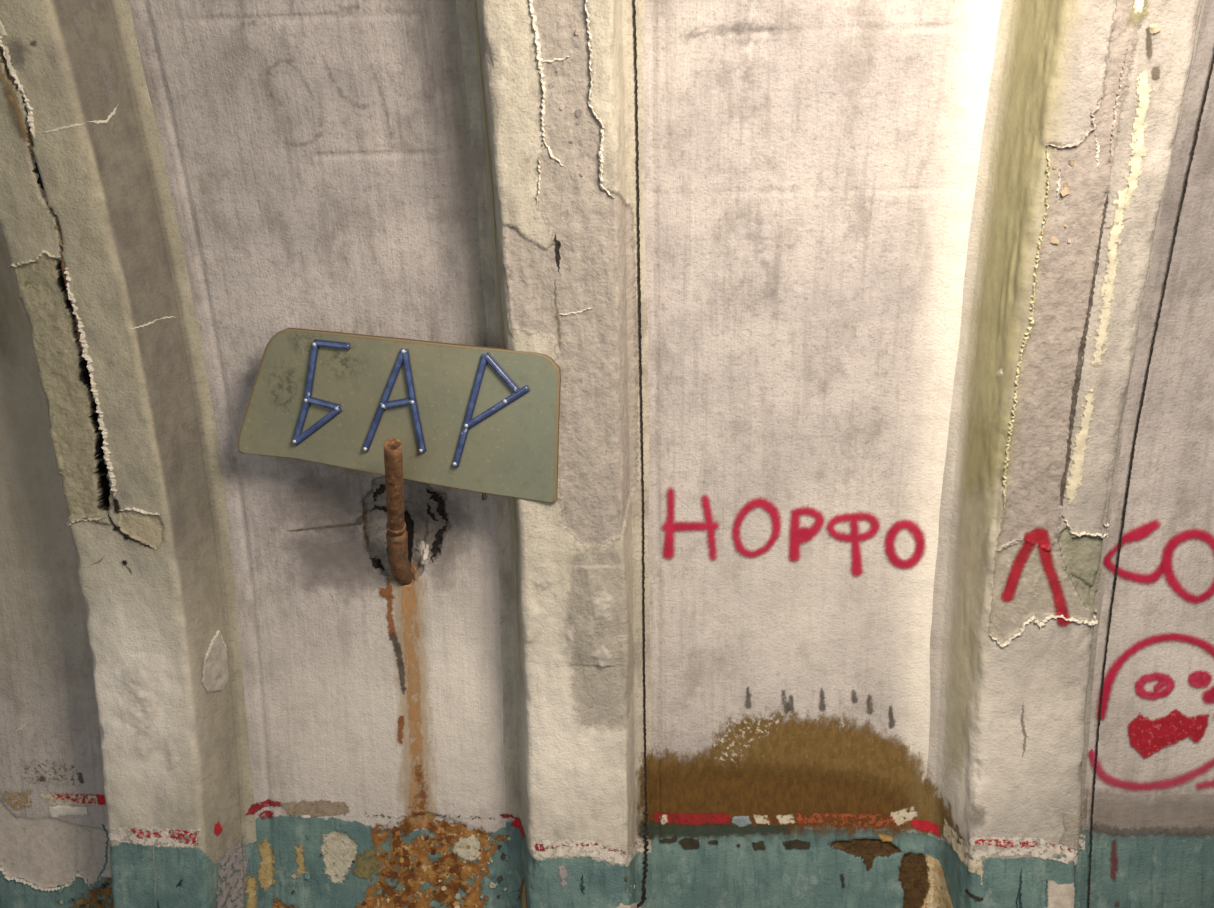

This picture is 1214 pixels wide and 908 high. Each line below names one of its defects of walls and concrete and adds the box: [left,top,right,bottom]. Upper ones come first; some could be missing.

crack [0,35,155,574]
flaking render [503,0,640,551]
flaking render [988,0,1161,648]
spalling [361,475,396,582]
spalling [403,479,450,581]
rust [356,564,509,908]
peeling [0,792,112,892]
peeling [130,821,222,845]
peeling [216,837,275,908]
peeling [290,831,381,894]